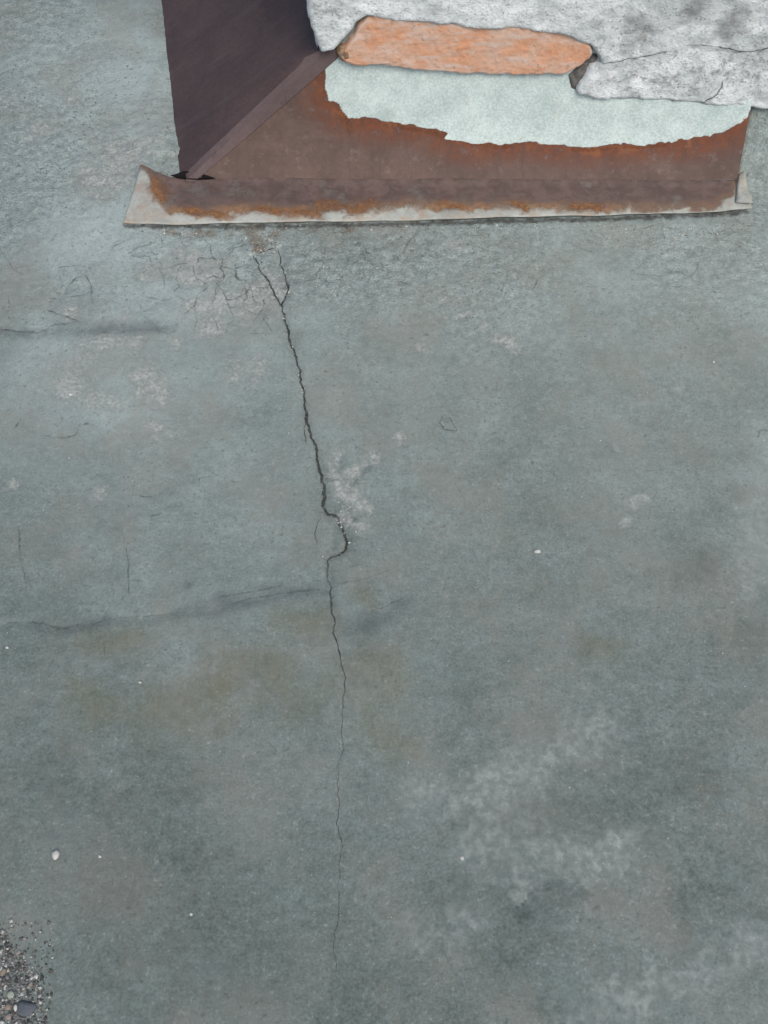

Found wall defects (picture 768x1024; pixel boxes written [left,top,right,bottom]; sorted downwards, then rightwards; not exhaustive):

flaking render [336,15,598,89]
rust [139,70,750,220]
crack [194,245,357,753]